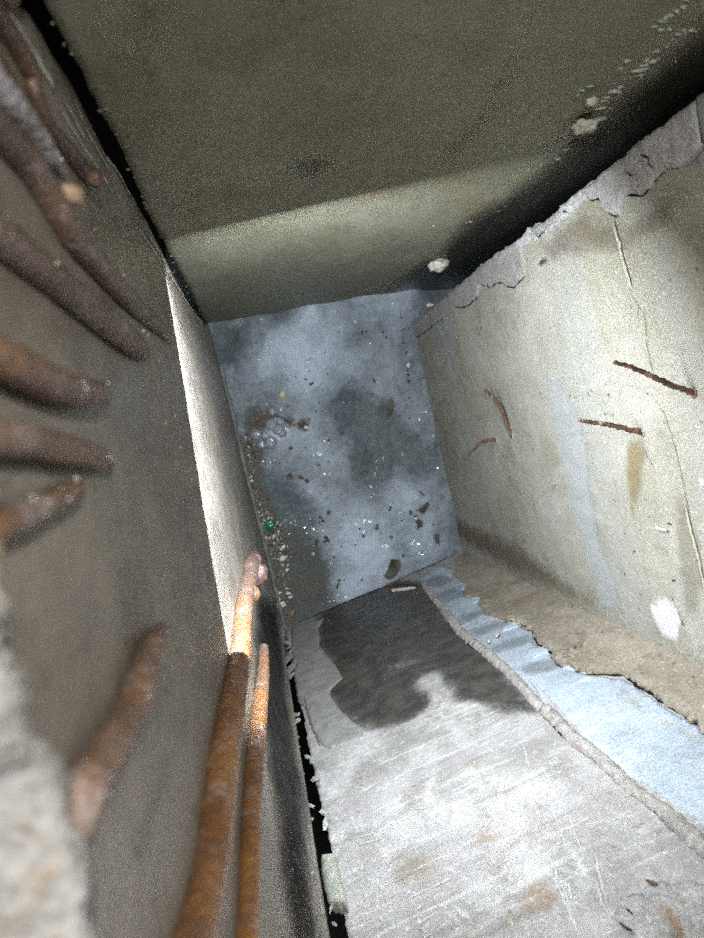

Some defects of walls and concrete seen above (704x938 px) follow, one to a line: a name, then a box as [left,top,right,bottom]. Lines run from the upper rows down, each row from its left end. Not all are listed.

corrosion [0,0,174,345]
peeling [593,86,623,121]
spalling [531,93,704,235]
spalling [413,242,526,338]
corrosion [0,334,110,407]
corrosion [0,418,116,543]
corrosion [628,444,643,497]
damp [318,581,535,729]
peeling [526,646,549,658]
corrosion [67,622,169,844]
corrosion [172,551,270,938]
spalling [614,880,704,938]